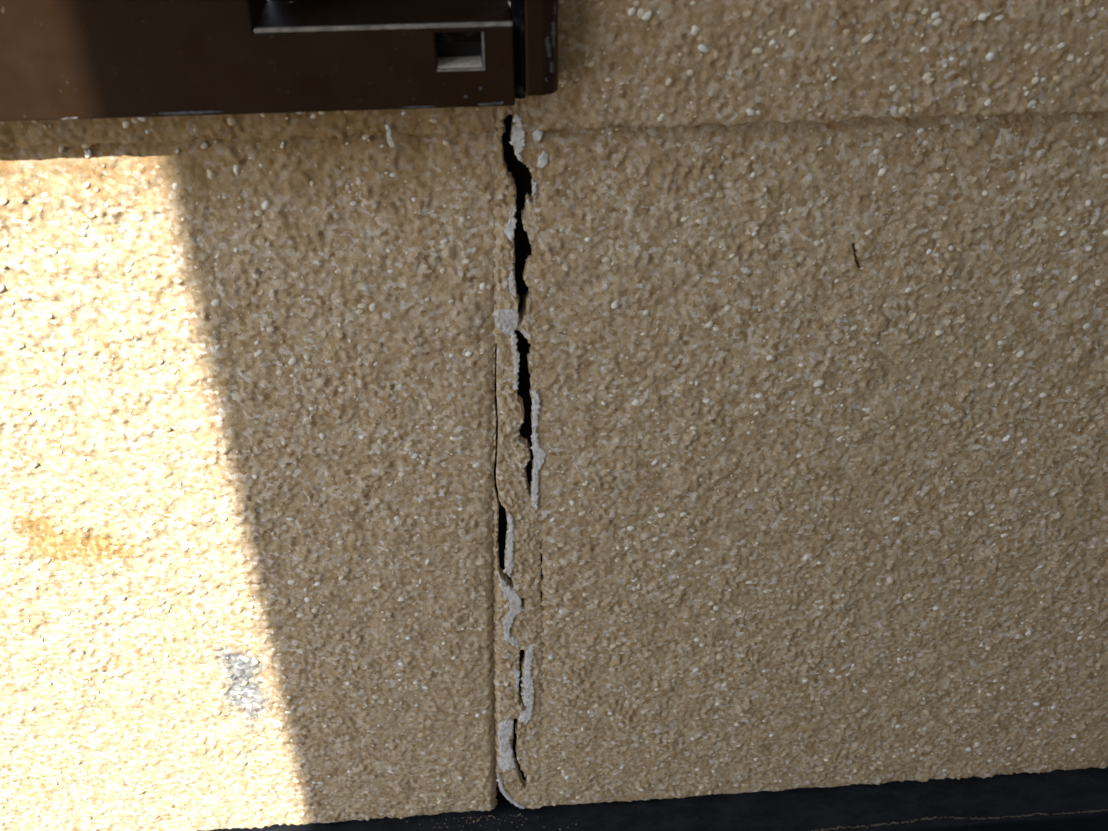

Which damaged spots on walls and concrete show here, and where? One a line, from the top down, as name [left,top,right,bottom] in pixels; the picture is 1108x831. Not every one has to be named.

crack [494,113,547,809]